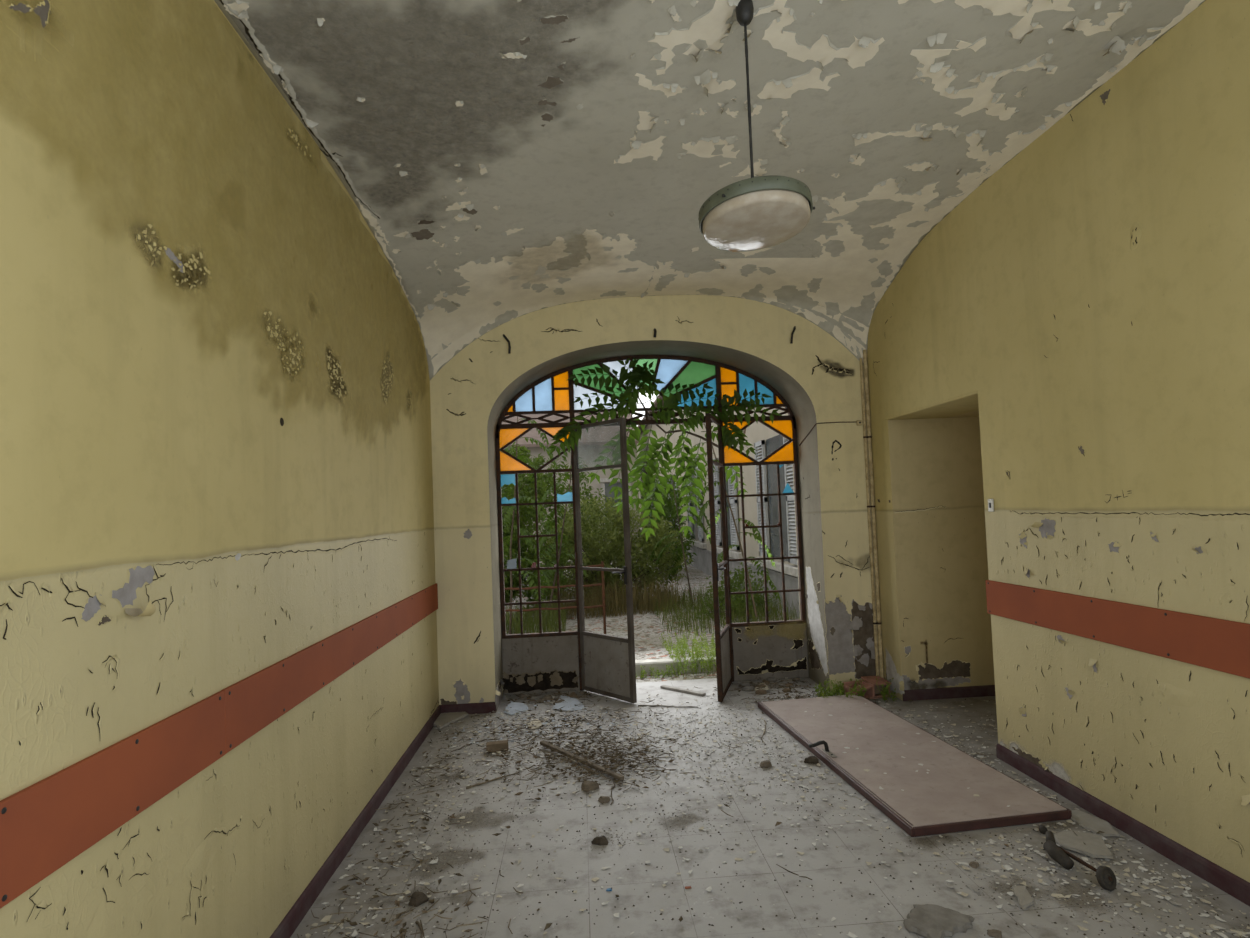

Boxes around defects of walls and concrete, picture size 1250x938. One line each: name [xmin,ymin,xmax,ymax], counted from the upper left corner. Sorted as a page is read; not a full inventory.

peeling [8,0,51,30]
damp [245,0,610,206]
peeling [355,0,1204,376]
damp [263,311,305,379]
damp [326,348,347,400]
spalling [1019,517,1056,549]
spalling [80,565,156,627]
spalling [305,566,1250,938]